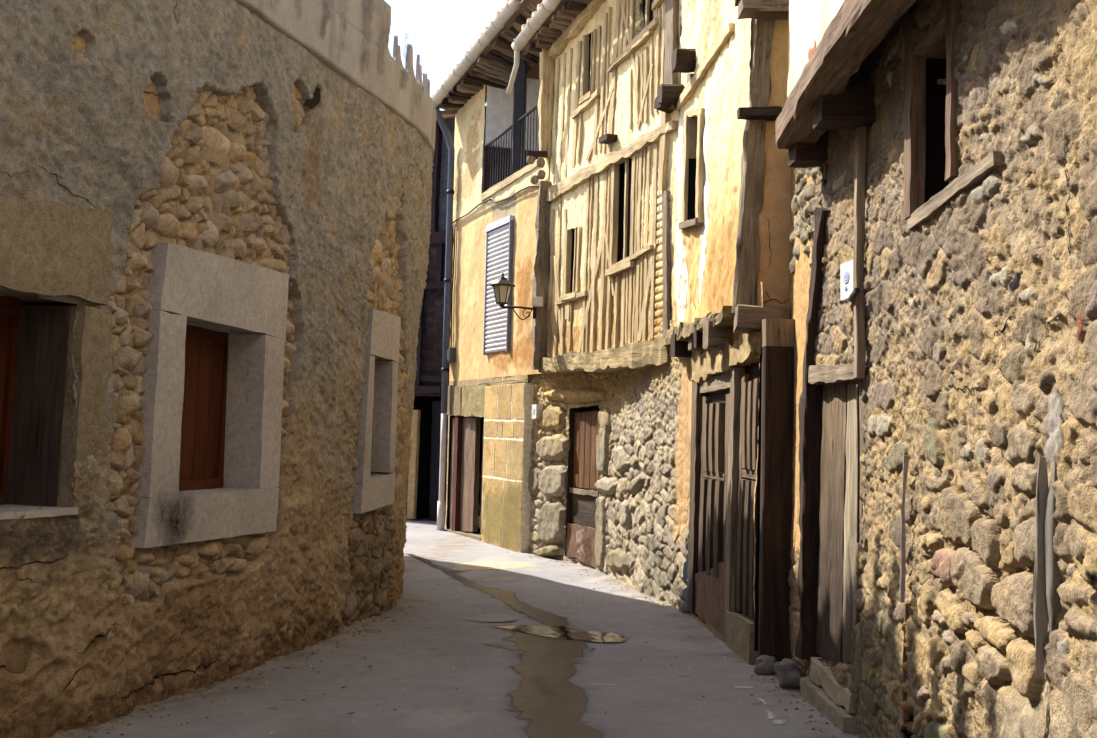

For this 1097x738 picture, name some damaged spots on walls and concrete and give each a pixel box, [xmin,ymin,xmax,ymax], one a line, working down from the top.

spalling [291,86,321,129]
crack [7,162,96,205]
crack [1063,120,1071,254]
spalling [108,87,297,609]
spalling [333,218,412,635]
crack [0,554,68,583]
crack [114,657,223,701]
crack [1042,686,1050,738]